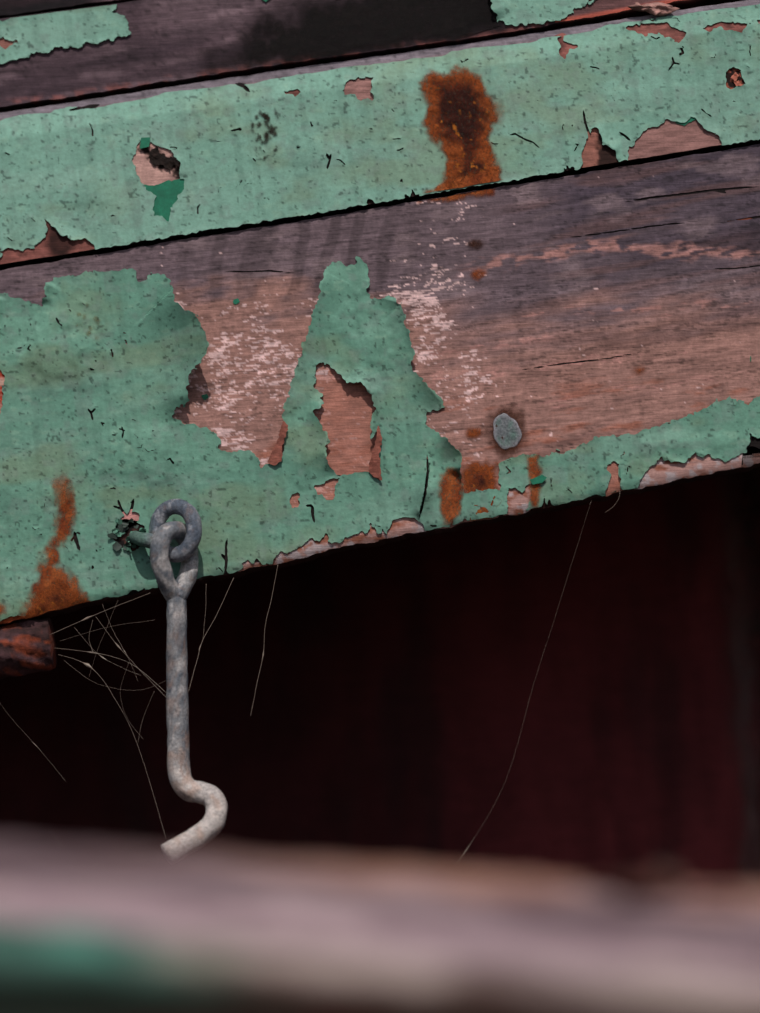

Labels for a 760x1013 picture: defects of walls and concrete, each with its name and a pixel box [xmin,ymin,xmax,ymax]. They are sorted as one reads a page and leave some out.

peeling [467,0,516,36]
peeling [555,0,686,59]
peeling [703,20,760,33]
peeling [343,77,374,101]
hole [726,68,745,89]
rust [420,66,501,201]
peeling [0,119,760,528]
rust [440,409,524,523]
rust [528,455,547,506]
peeling [107,509,146,552]
peeling [238,517,426,572]
rust [0,481,88,680]